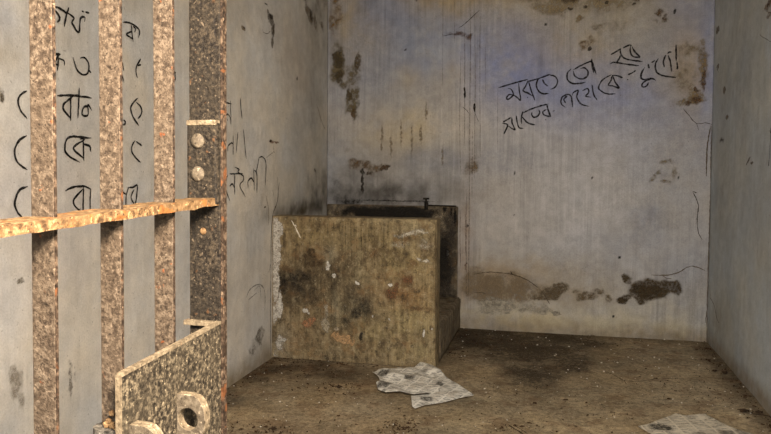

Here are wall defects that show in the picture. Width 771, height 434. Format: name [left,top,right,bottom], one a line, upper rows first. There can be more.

water stain [527,0,639,22]
water stain [678,40,708,106]
water stain [336,109,682,305]
water stain [277,248,324,292]